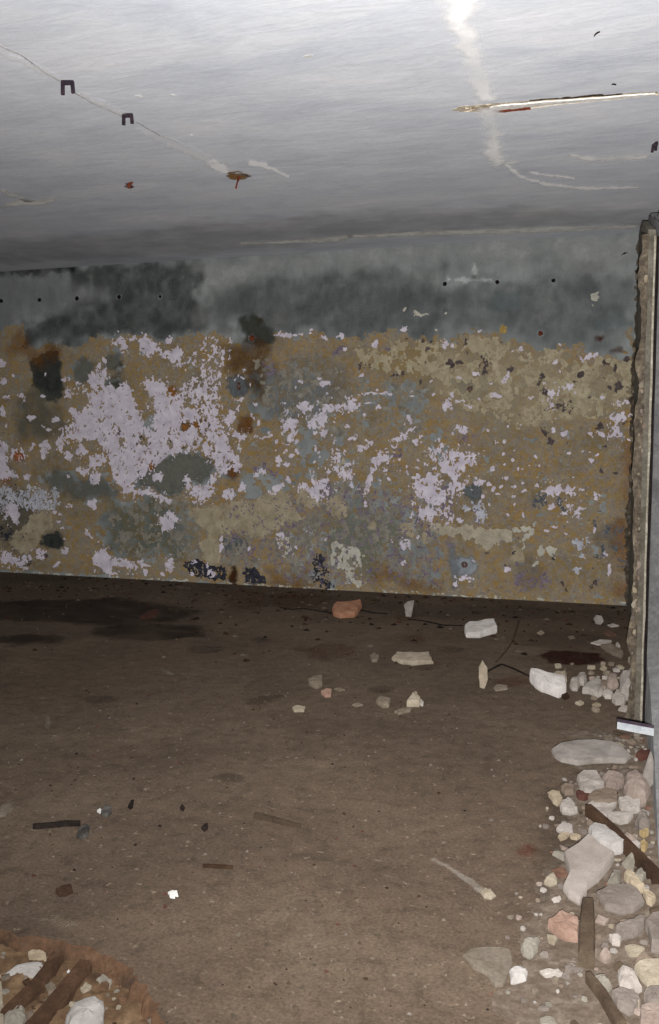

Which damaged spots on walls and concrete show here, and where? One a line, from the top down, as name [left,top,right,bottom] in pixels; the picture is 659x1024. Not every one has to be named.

crack [0,46,178,143]
crack [452,91,659,113]
rust [227,171,250,180]
damp [0,260,272,345]
damp [228,314,283,346]
peeling [0,221,656,723]